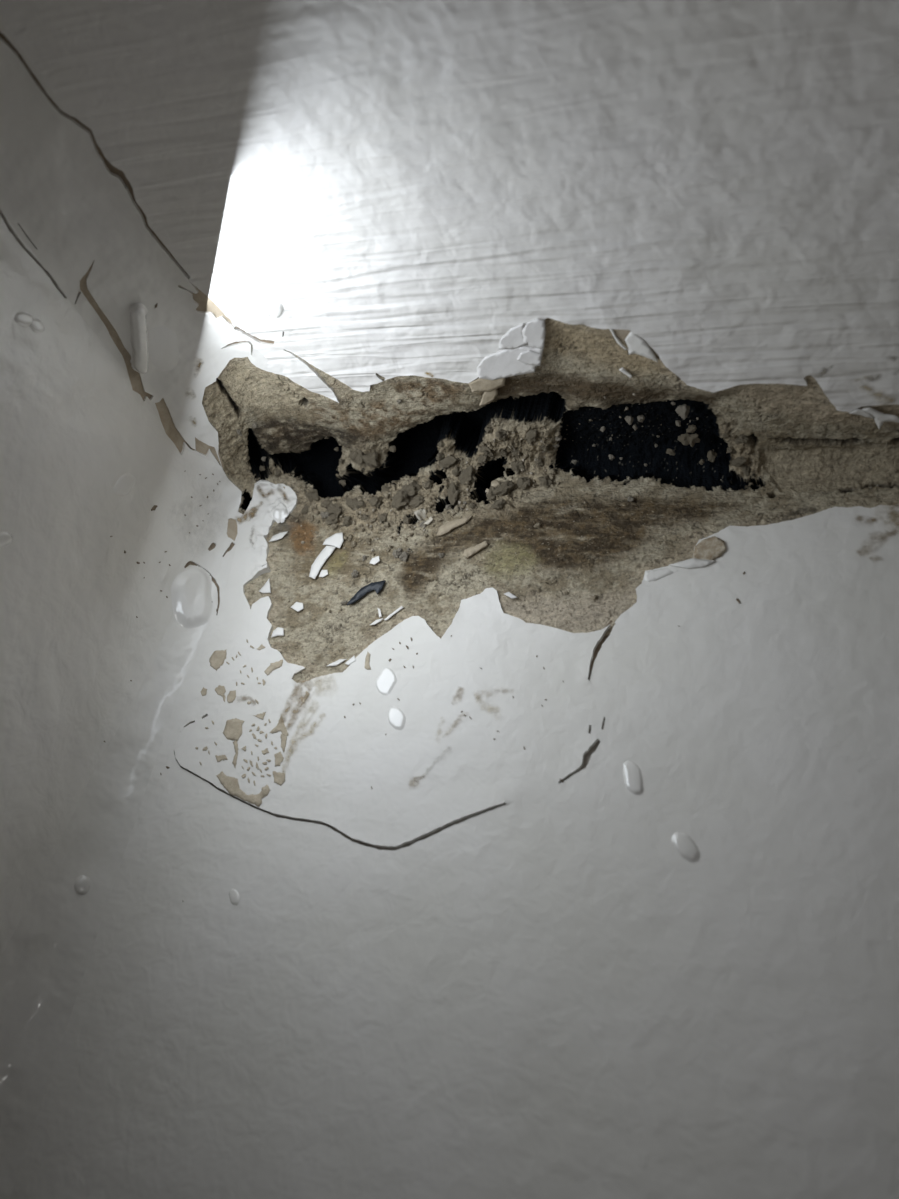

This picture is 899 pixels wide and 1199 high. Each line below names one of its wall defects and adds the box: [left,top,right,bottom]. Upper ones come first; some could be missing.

crack [0,32,190,277]
crack [0,212,79,298]
spalling [195,318,899,807]
crack [563,718,605,781]
crack [177,761,500,850]